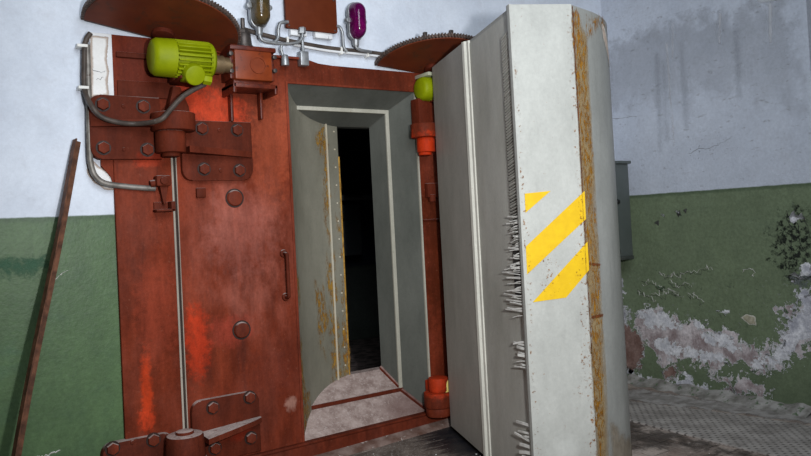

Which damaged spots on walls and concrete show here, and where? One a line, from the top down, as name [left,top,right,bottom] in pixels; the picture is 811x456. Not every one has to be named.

corrosion [316,127,342,241]
corrosion [571,6,606,456]
leakage [766,205,811,281]
corrosion [315,252,350,380]
peeling [622,262,811,399]